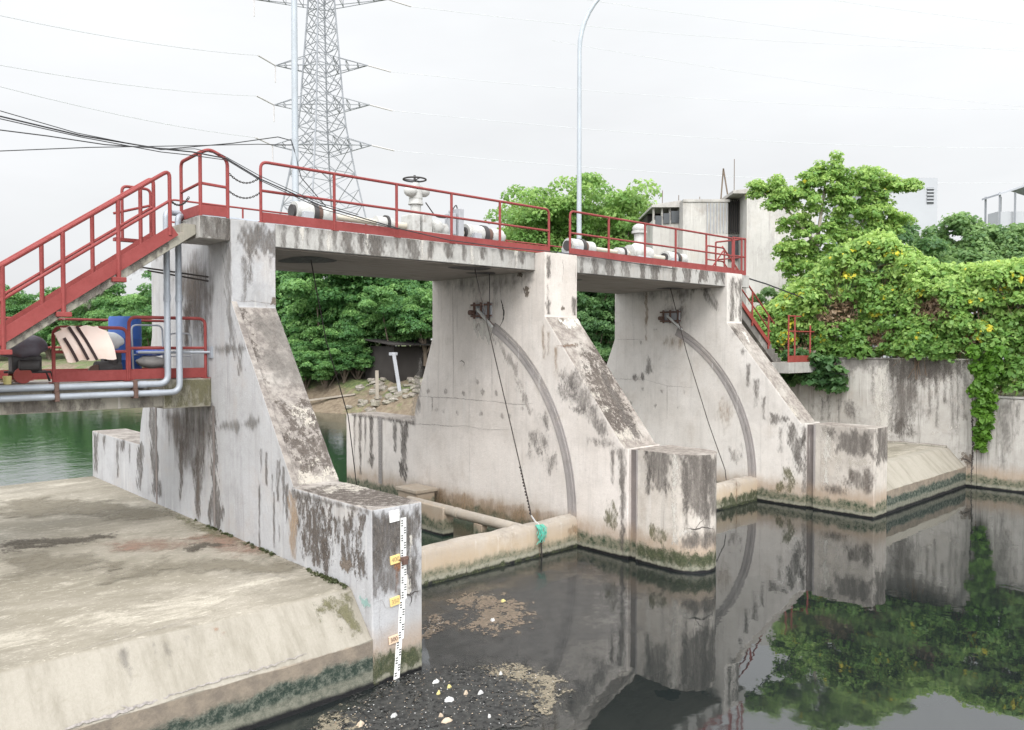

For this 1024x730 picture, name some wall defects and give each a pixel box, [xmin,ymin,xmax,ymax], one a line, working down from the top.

water stain [320,229,384,256]
water stain [396,238,432,260]
water stain [445,243,486,264]
water stain [0,389,420,596]
water stain [388,360,428,482]
water stain [564,343,641,547]
water stain [646,451,717,548]
water stain [822,358,973,493]